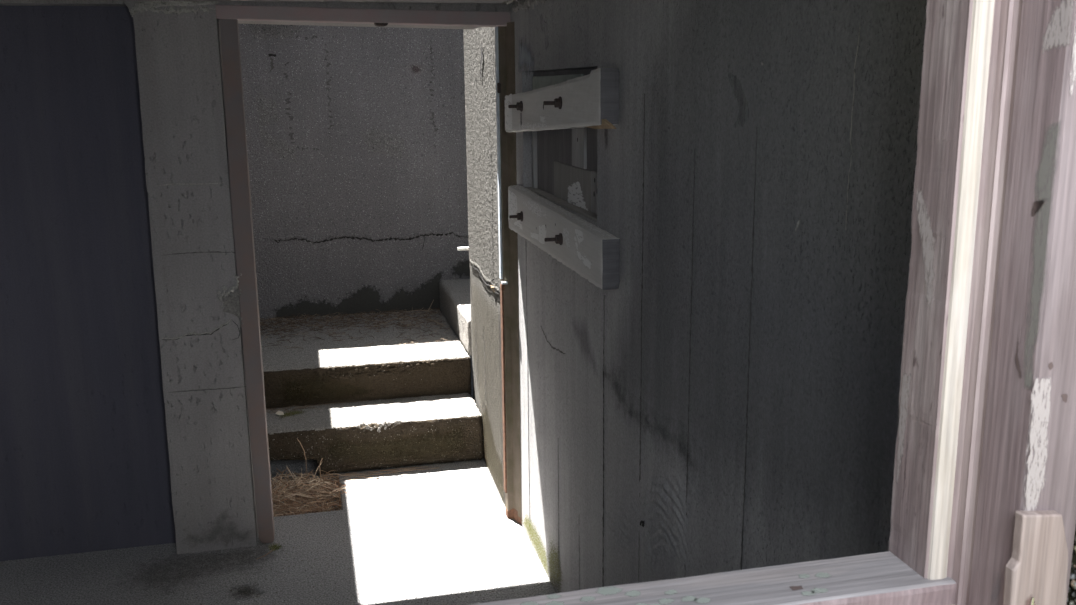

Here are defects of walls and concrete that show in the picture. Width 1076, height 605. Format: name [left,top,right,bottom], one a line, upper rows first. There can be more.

peeling [1042,0,1076,95]
crack [272,229,499,294]
peeling [1025,377,1051,511]